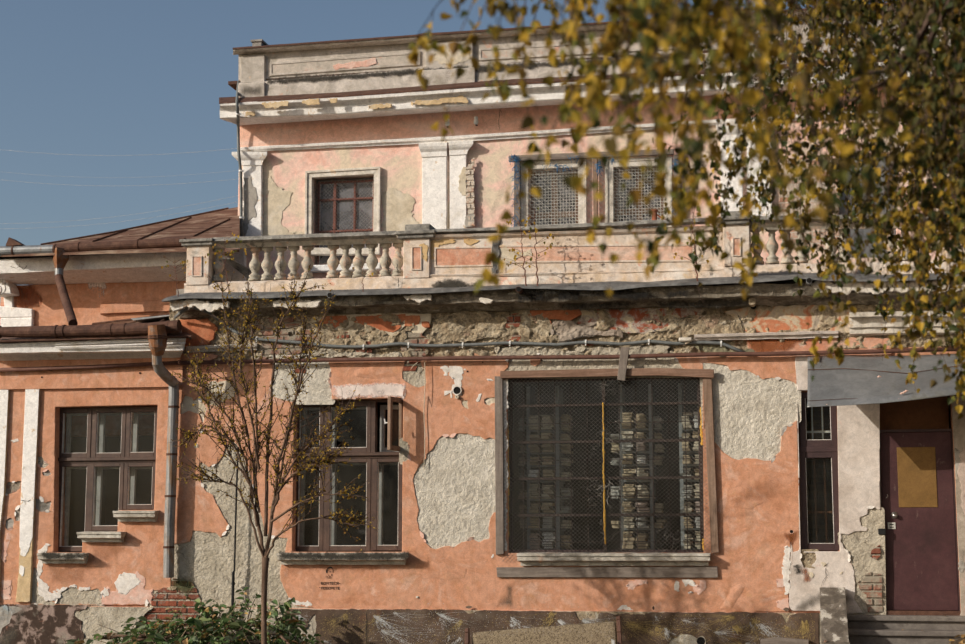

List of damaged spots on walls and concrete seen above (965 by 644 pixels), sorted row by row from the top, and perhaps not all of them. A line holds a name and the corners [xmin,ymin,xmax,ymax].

peeling [243,175,304,242]
spalling [181,381,235,448]
spalling [236,311,801,558]
spalling [0,442,317,644]
peeling [776,546,827,623]
spalling [838,506,886,615]
spalling [670,633,697,644]